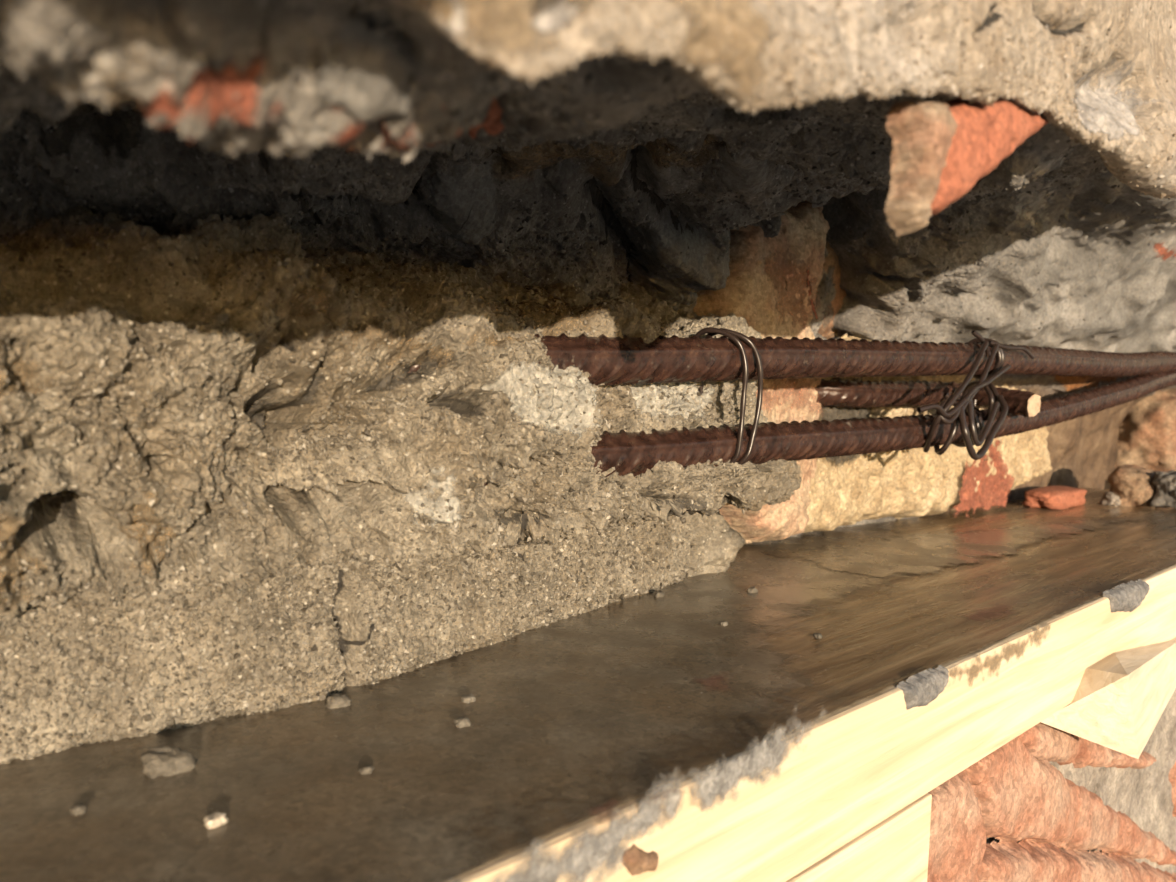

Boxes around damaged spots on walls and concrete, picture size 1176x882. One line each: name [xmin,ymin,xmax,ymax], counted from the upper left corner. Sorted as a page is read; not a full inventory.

spalling [40,102,142,161]
spalling [725,107,788,125]
spalling [1075,60,1168,140]
spalling [243,371,327,430]
spalling [365,351,455,392]
spalling [427,383,484,417]
corrosion [1052,375,1122,392]
spalling [534,333,1176,517]
spalling [33,489,77,522]
spalling [494,509,550,528]
crack [332,570,375,654]